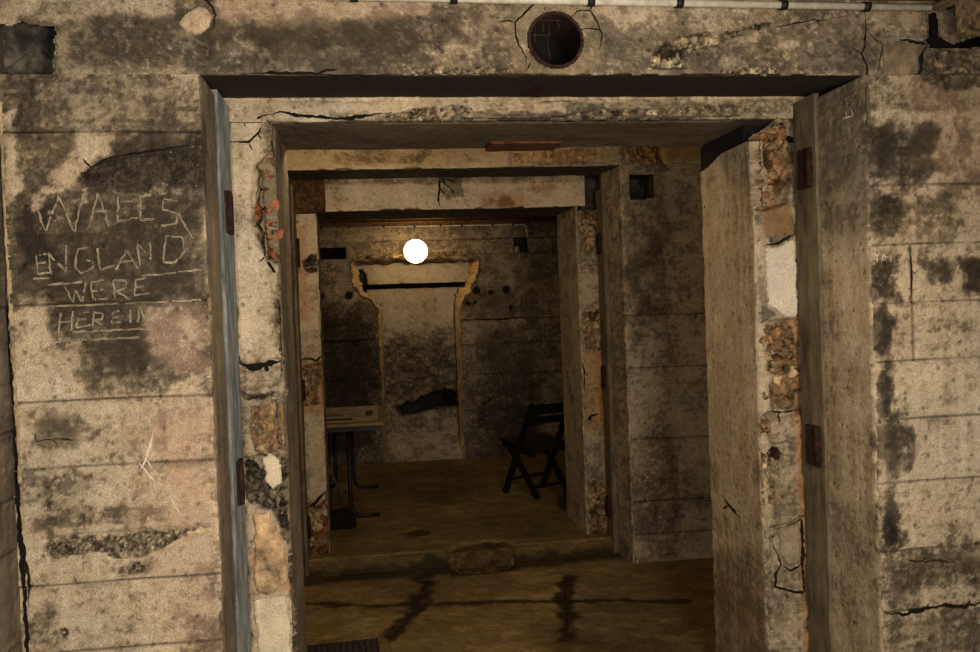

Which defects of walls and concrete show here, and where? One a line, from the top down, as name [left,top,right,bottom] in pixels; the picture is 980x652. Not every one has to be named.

crack [499,4,545,72]
spalling [647,22,772,70]
crack [853,18,928,75]
crack [78,143,201,182]
crack [230,111,392,149]
spalling [700,124,794,213]
spalling [351,251,479,464]
spalling [758,321,801,514]
crack [5,277,73,652]
spalling [43,526,212,575]
crack [769,519,806,594]
crack [884,600,980,617]